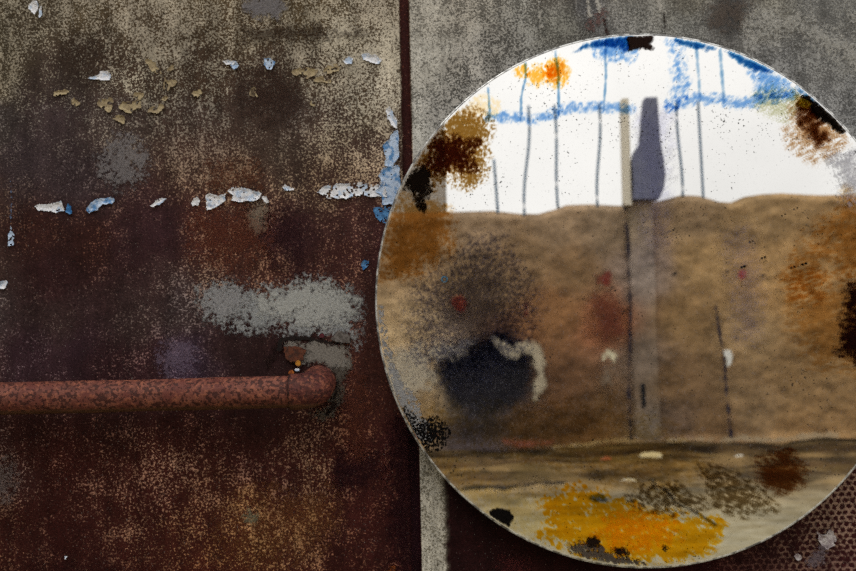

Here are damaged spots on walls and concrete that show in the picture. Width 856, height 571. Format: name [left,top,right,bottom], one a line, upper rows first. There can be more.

peeling [88,71,111,81]
peeling [291,53,382,83]
peeling [53,89,80,106]
peeling [97,59,177,124]
peeling [317,107,401,224]
peeling [35,200,72,214]
peeling [86,197,114,213]
peeling [191,187,269,210]